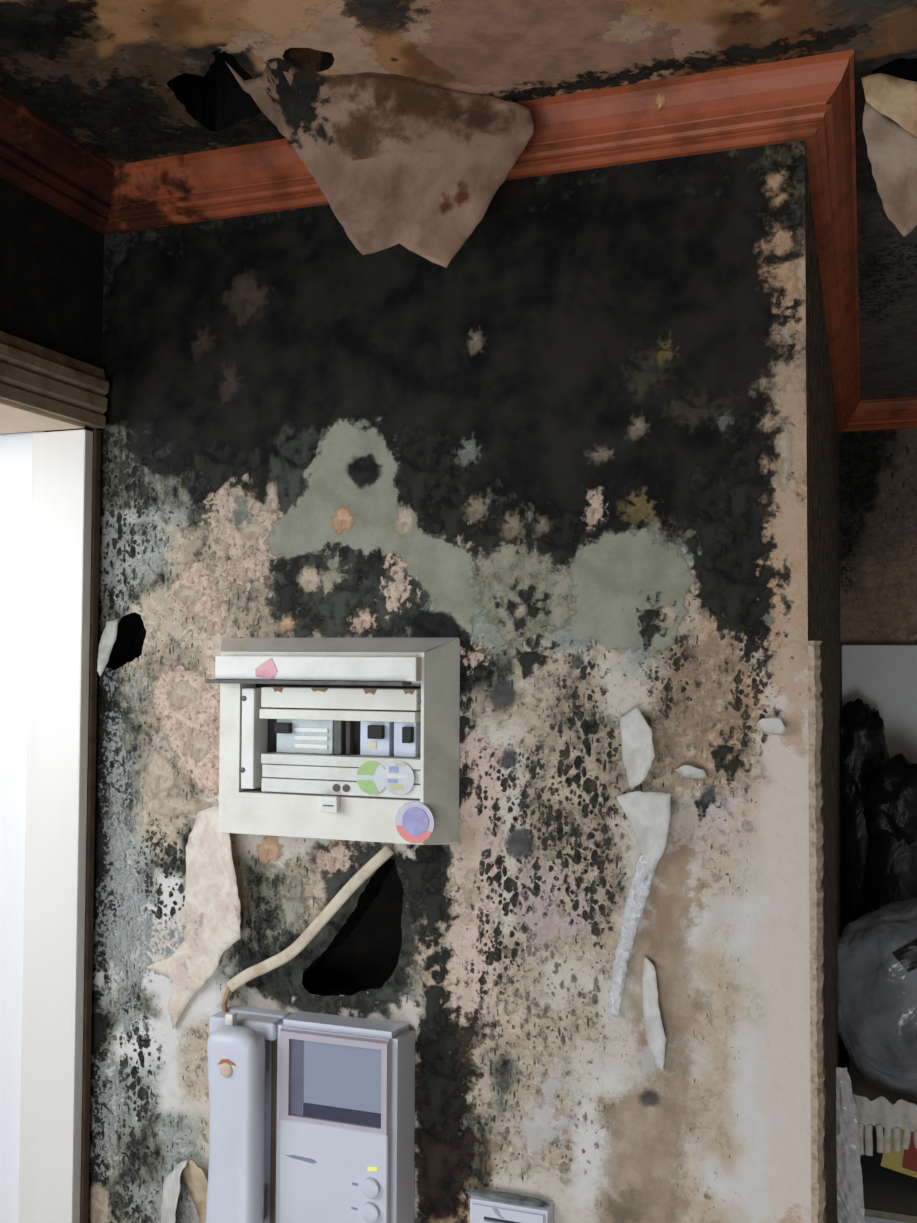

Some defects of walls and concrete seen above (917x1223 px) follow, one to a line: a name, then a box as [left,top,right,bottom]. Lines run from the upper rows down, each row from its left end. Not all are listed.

peeling [219,0,390,77]
water stain [488,0,915,102]
water stain [0,0,803,748]
water stain [89,666,172,1223]
peeling [88,612,220,1223]
water stain [135,824,186,928]
flaking render [310,840,358,877]
spalling [302,858,407,996]
water stain [241,542,627,1223]
water stain [702,788,714,803]
water stain [549,845,705,1223]